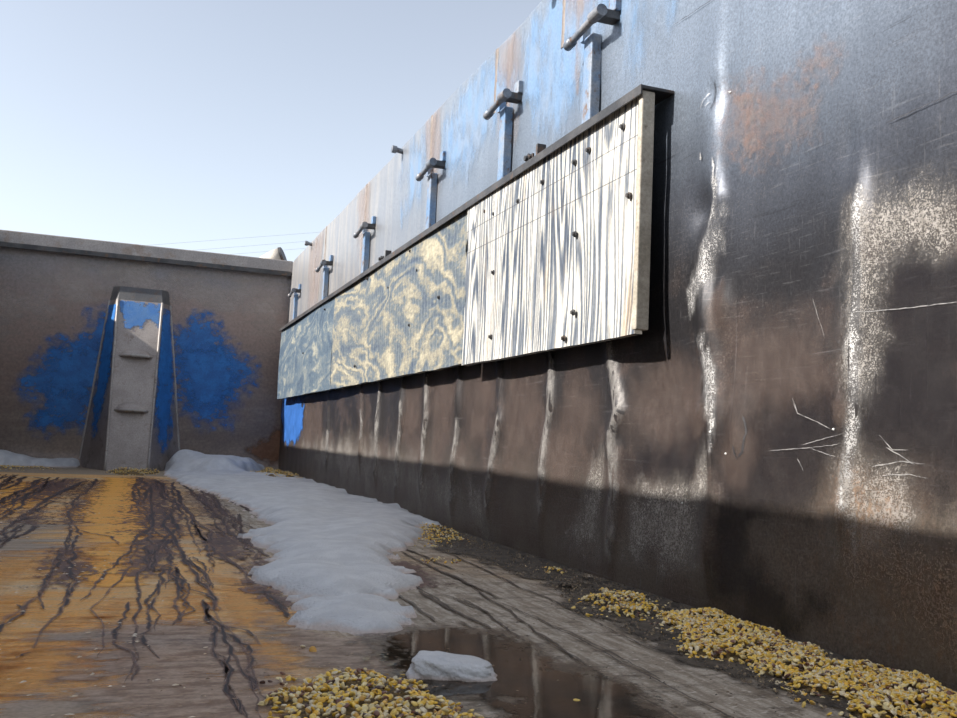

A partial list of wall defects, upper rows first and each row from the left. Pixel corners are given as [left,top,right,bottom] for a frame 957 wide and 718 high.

peeling [18,300,260,453]